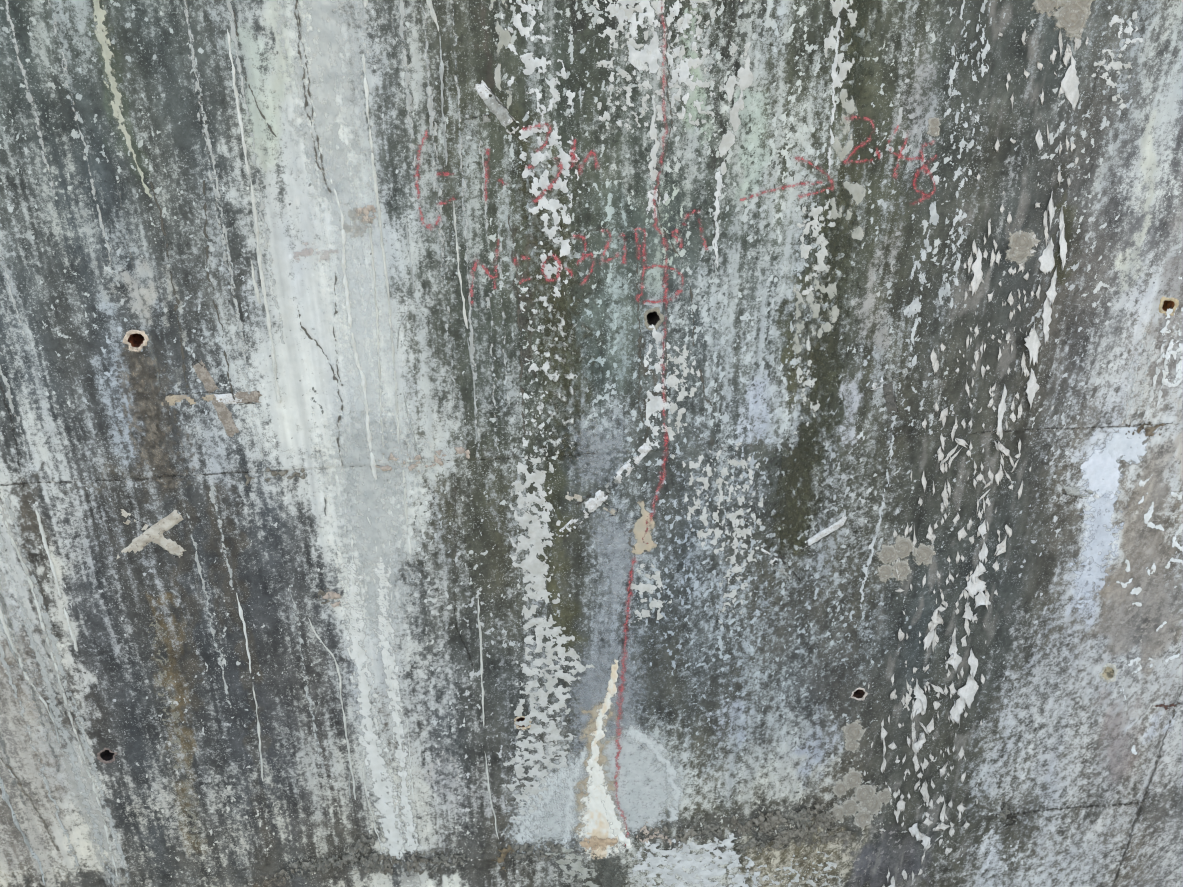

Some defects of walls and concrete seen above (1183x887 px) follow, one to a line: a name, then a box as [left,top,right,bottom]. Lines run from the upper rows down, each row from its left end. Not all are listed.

water stain [0,497,129,887]
water stain [93,0,152,198]
water stain [209,485,251,673]
water stain [277,0,428,887]
water stain [420,0,510,457]
water stain [485,506,683,887]
peeling [489,0,767,821]
water stain [712,170,725,271]
peeling [790,0,866,434]
water stain [787,0,883,472]
peeling [871,0,1079,887]
peeling [1006,6,1143,110]